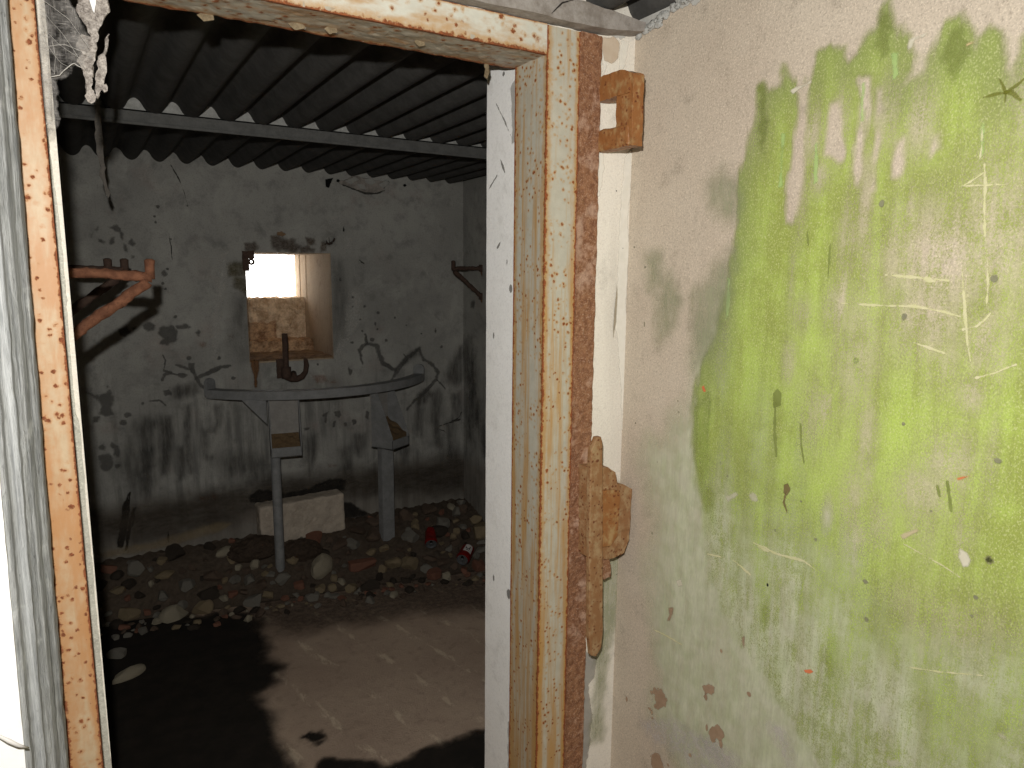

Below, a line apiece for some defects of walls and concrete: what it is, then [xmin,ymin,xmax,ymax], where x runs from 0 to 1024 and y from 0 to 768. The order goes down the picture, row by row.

water stain [90,391,131,425]
water stain [99,408,189,491]
crack [152,355,231,406]
crack [358,334,445,410]
water stain [773,390,781,457]
water stain [99,459,324,538]
water stain [936,481,952,512]